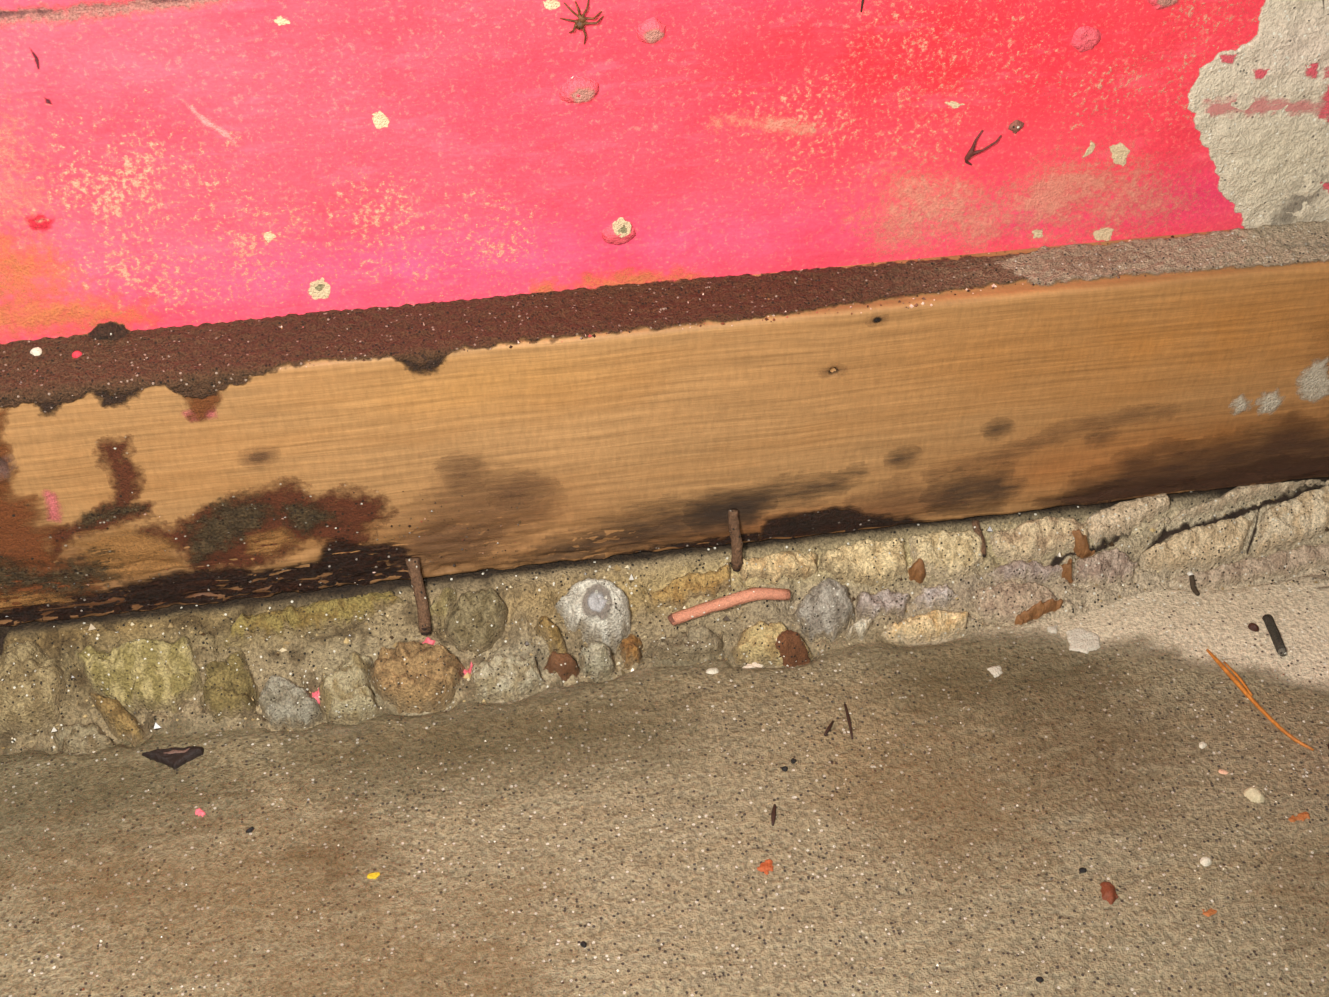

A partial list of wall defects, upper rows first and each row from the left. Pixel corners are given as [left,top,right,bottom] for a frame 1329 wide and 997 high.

crack [0,0,219,26]
peeling [707,0,1329,251]
leakage [551,479,928,558]
leakage [935,478,1015,506]
crack [1050,487,1317,566]
leakage [1048,427,1329,505]
leakage [0,539,411,626]
leakage [0,635,1329,997]